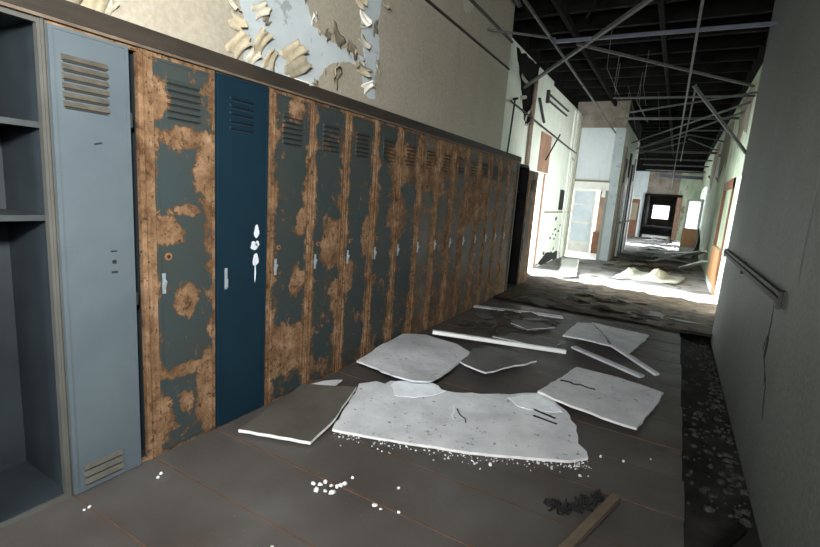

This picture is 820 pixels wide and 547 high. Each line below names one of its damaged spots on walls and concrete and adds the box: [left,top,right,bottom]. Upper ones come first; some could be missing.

peeling [67,0,120,14]
peeling [225,0,392,99]